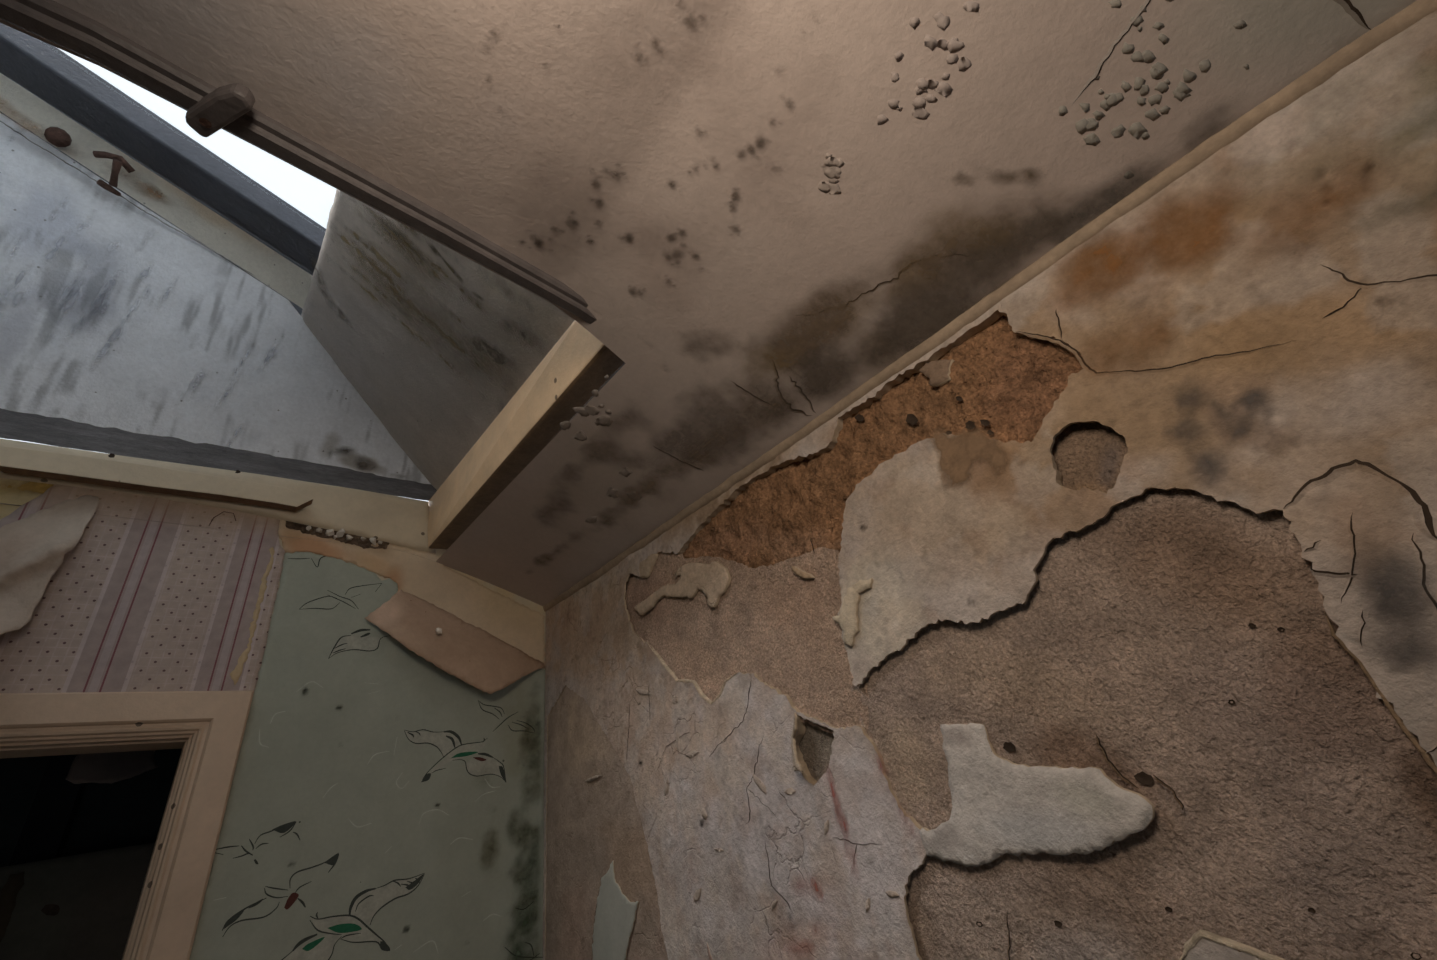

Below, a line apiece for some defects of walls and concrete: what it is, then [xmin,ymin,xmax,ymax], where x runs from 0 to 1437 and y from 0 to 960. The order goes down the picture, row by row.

crack [1072,0,1151,104]
crack [1333,0,1371,30]
leakage [341,210,508,373]
leakage [763,170,1147,396]
leakage [1072,205,1229,289]
crack [1017,310,1293,376]
crack [1320,264,1437,318]
flaking render [626,315,1437,960]
crack [1304,512,1366,647]
crack [1283,459,1437,620]
peeling [545,686,668,960]
leakage [510,824,538,960]